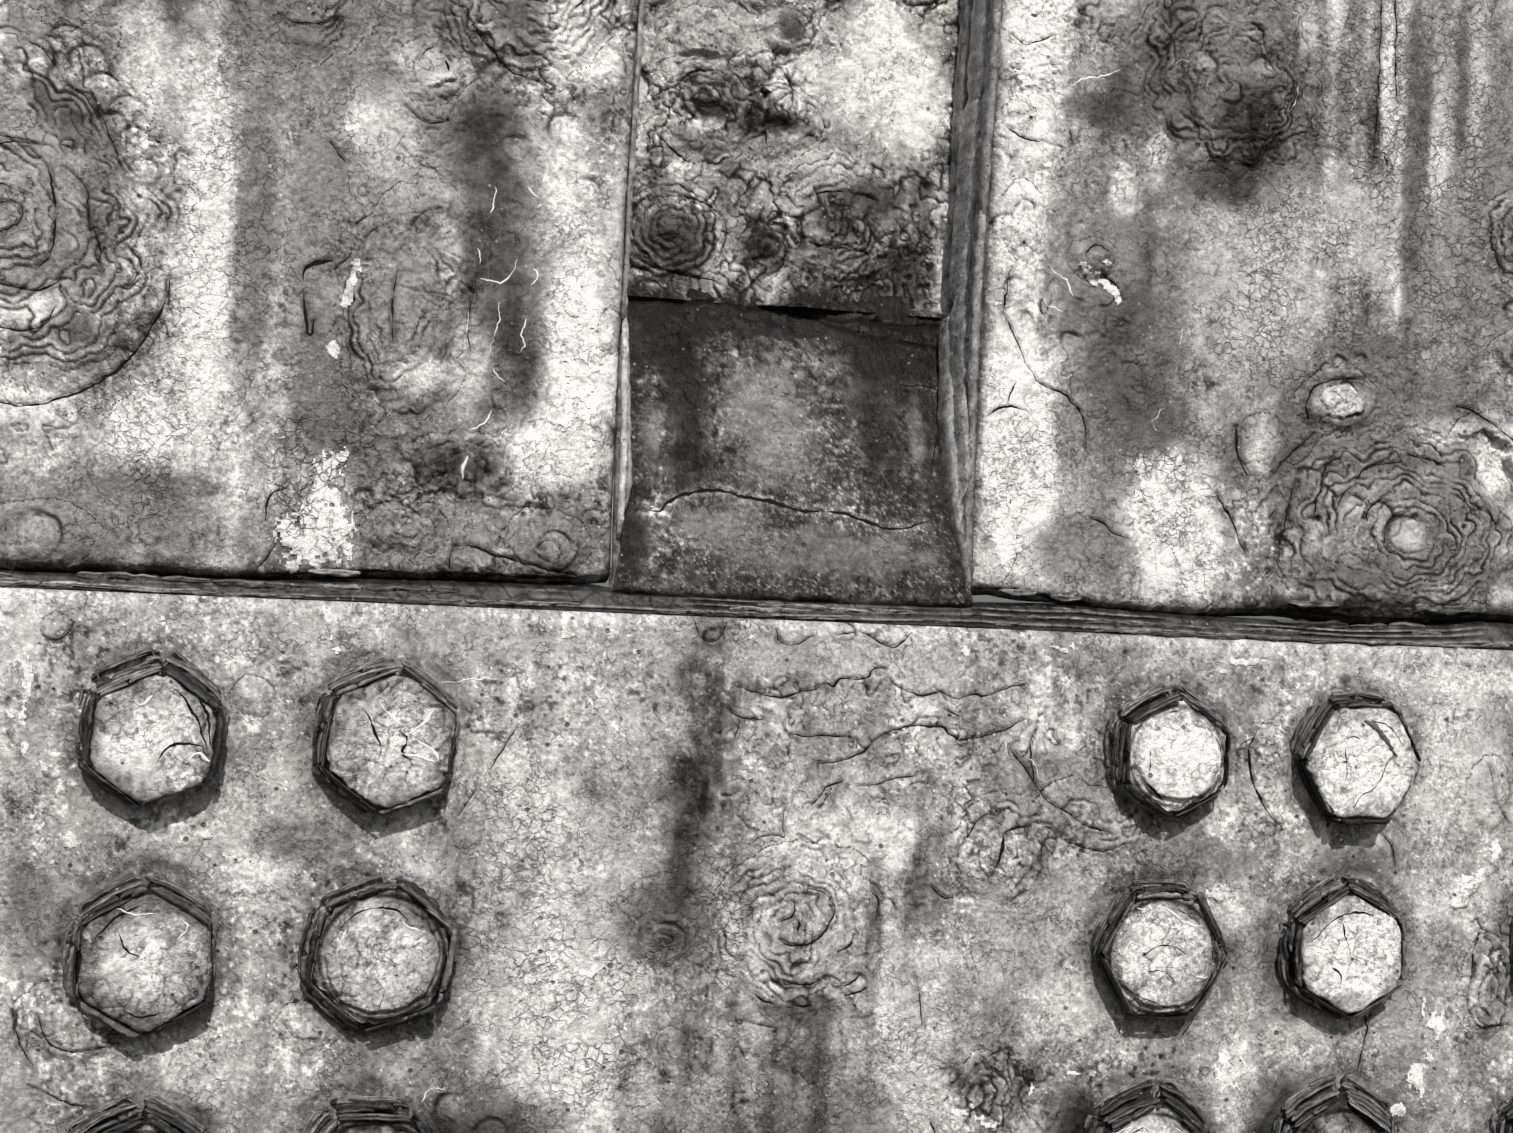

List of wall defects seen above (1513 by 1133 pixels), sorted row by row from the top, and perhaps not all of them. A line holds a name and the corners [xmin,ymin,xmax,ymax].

leakage [477,248,538,285]
peeling [273,446,361,577]
crack [641,488,929,530]
crack [725,628,1127,852]
crack [1134,750,1165,803]